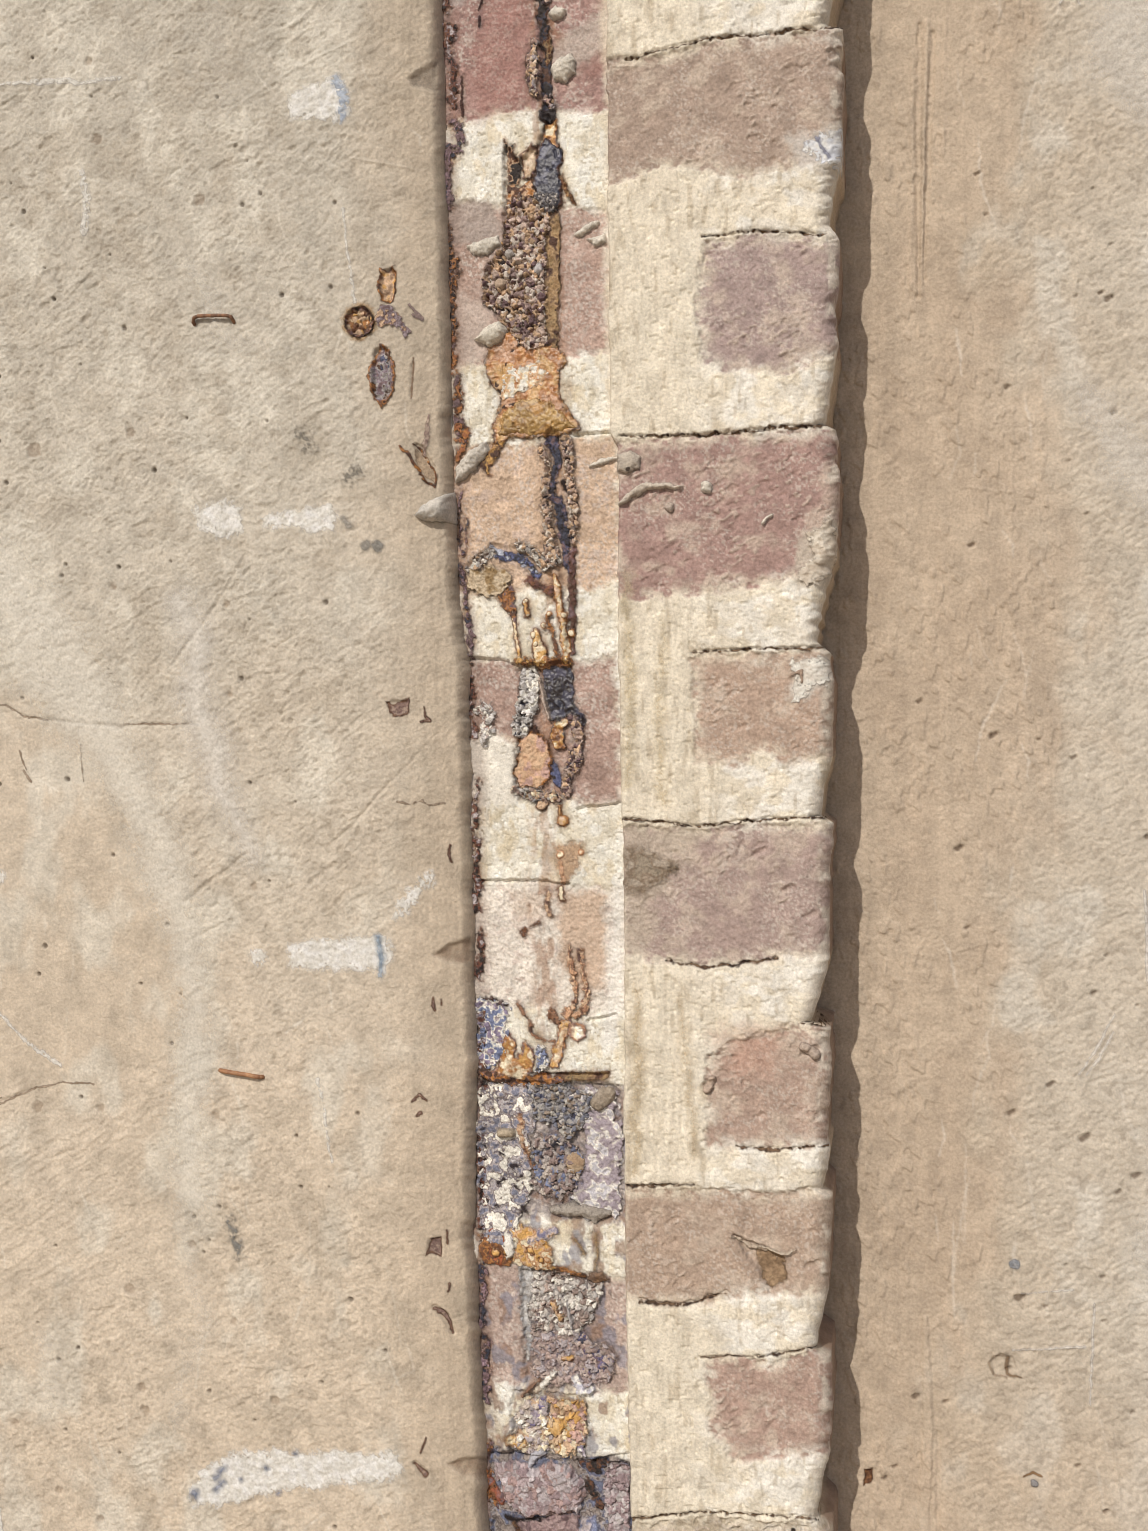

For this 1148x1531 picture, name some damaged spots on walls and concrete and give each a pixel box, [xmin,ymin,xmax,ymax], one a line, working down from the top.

crack [525,0,555,125]
rust [342,266,424,409]
rust [442,0,470,462]
spalling [481,192,561,350]
rust [480,331,581,475]
rust [503,109,576,213]
spalling [465,539,562,598]
crack [0,704,84,783]
crack [117,721,195,729]
spalling [473,665,586,803]
spalling [475,1081,624,1246]
spalling [488,1265,632,1531]